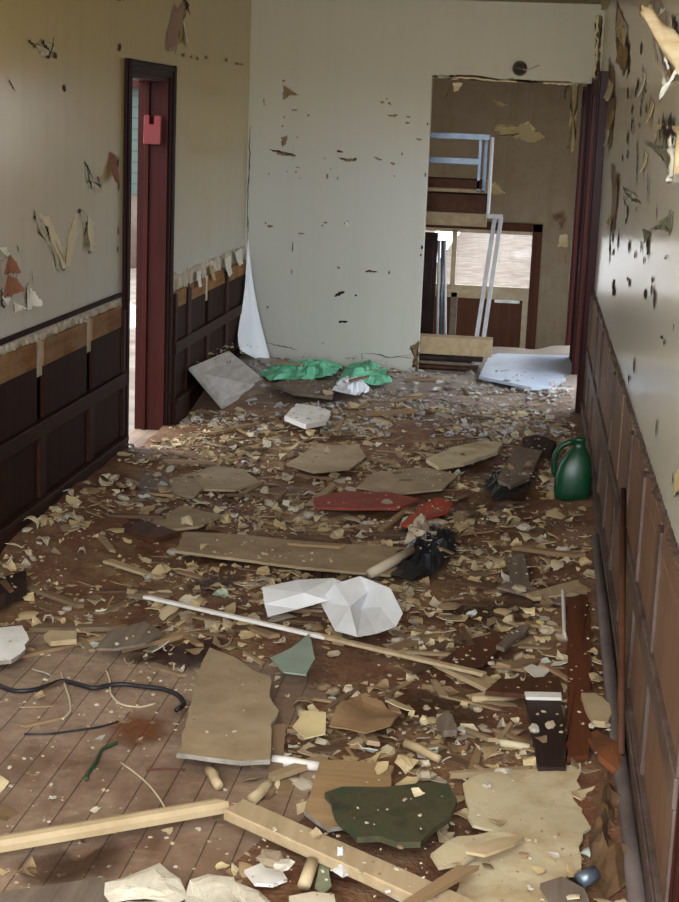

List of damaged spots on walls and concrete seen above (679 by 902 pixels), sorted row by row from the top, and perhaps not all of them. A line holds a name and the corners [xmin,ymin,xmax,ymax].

peeling [166,0,190,50]
flaking render [432,75,577,113]
peeling [591,2,673,265]
peeling [84,161,102,194]
peeling [33,208,95,271]
peeling [0,246,43,313]
peeling [182,248,243,288]